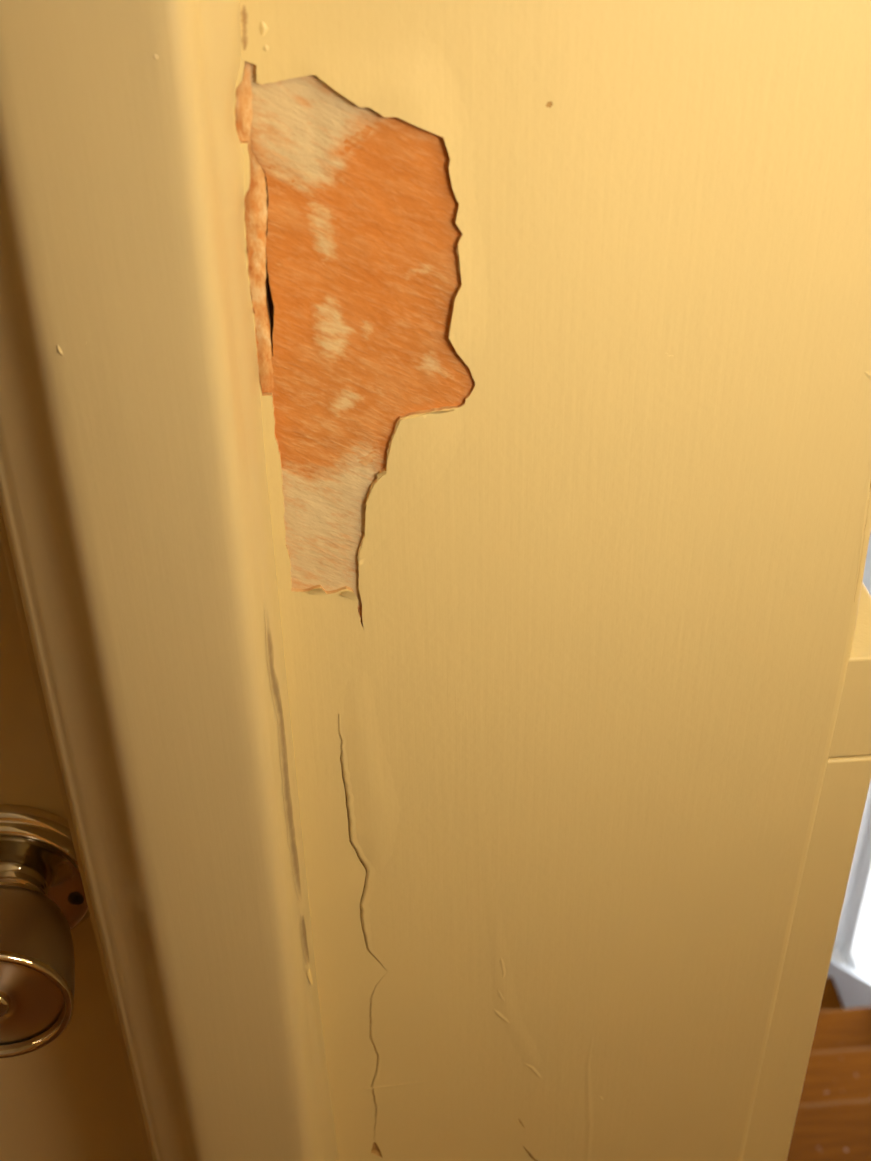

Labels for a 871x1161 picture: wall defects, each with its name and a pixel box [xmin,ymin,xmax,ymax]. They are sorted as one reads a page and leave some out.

peeling [235,62,475,630]
crack [338,714,389,1158]